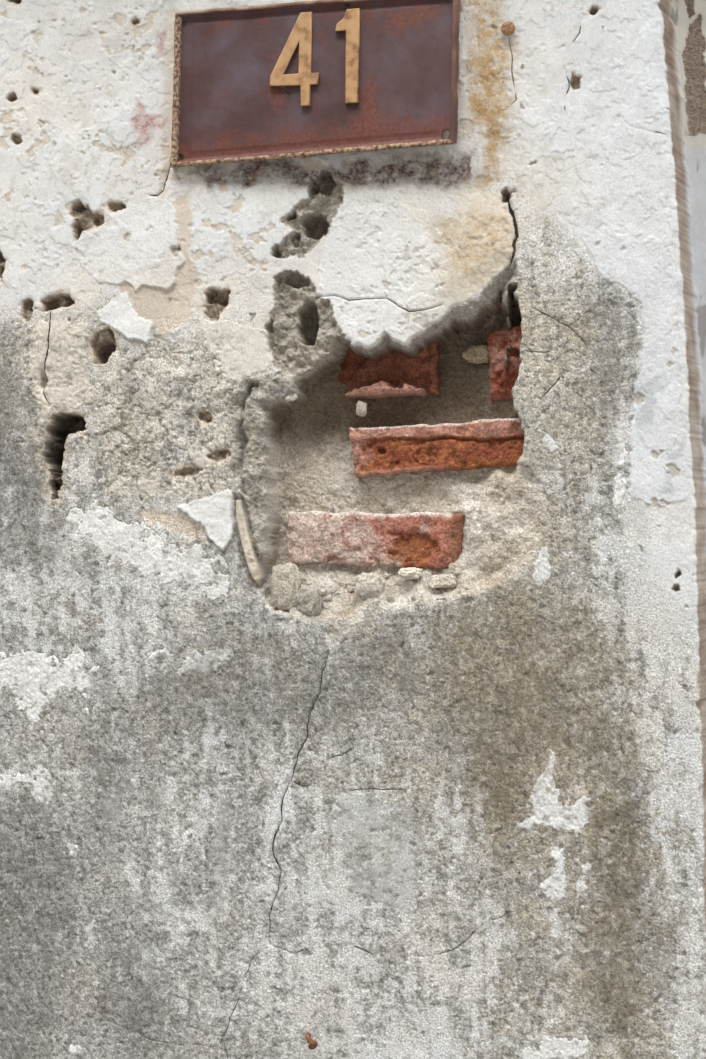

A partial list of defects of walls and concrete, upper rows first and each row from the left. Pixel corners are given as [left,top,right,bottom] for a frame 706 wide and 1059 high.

peeling [74,198,185,343]
crack [43,310,51,405]
peeling [26,318,98,445]
spalling [66,260,551,642]
crack [93,655,328,1059]
crack [438,911,513,955]
peeling [516,750,594,838]
peeling [539,846,592,909]